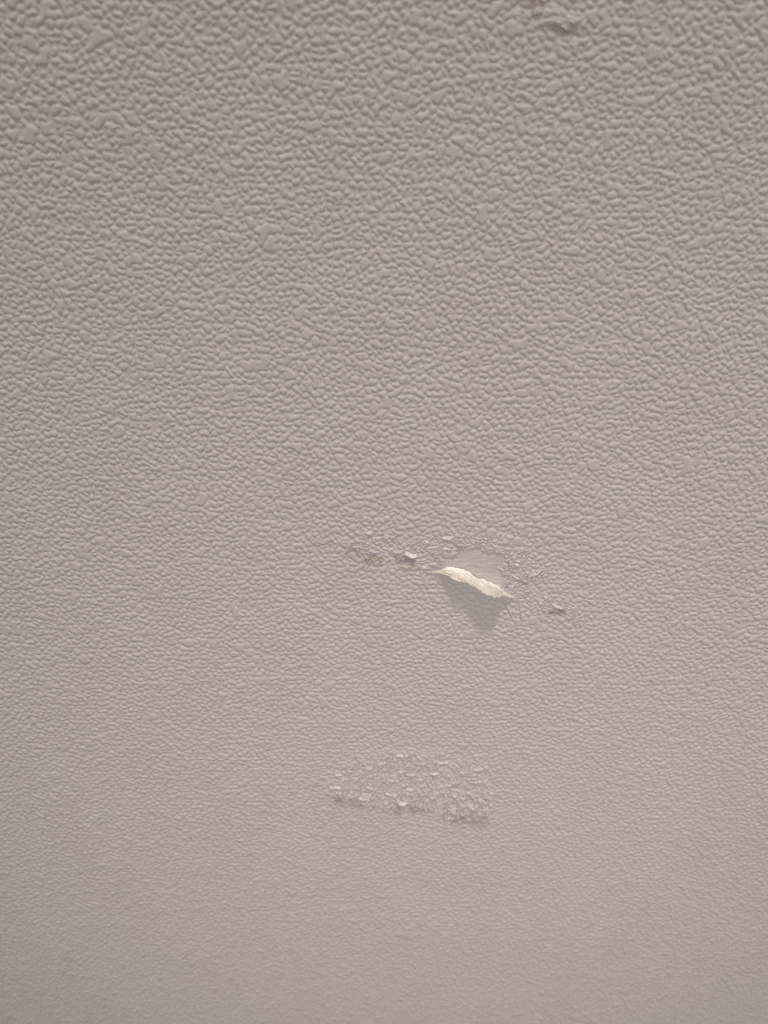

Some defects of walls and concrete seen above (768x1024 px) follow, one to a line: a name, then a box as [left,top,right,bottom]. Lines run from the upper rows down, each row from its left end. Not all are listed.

peeling [368,536,514,599]